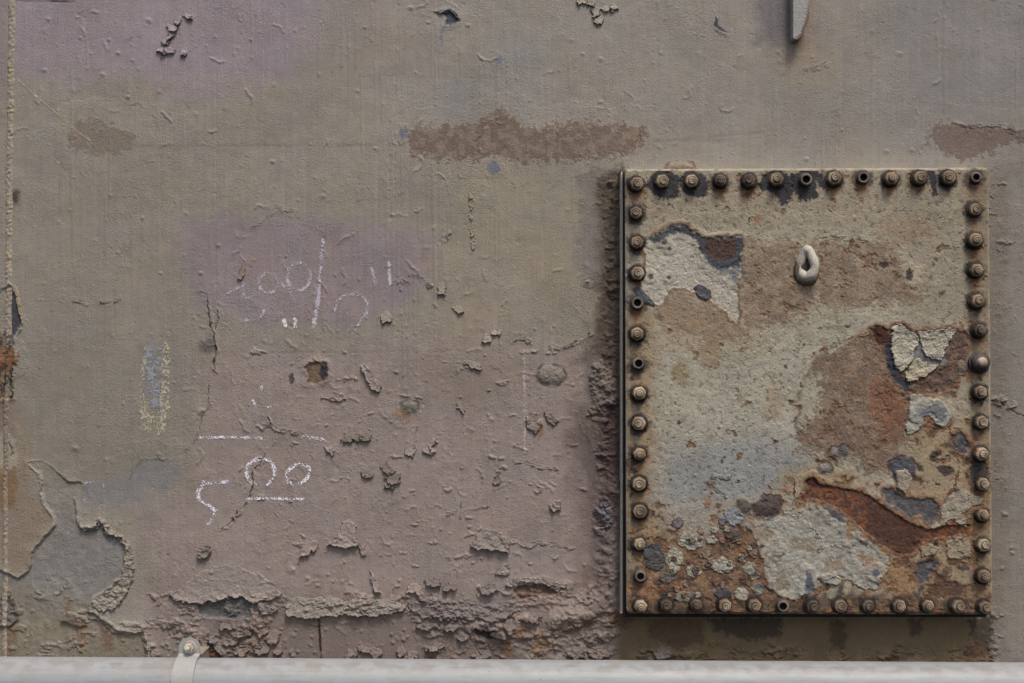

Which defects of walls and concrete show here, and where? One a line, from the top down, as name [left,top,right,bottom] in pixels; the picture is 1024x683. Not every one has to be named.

peeling [633,218,750,324]
crack [128,288,223,480]
peeling [284,355,347,402]
corrosion [628,206,980,611]
peeling [861,315,976,435]
peeling [0,459,151,657]
peeling [298,519,366,558]
peeling [169,528,572,659]
peeling [568,646,606,660]
corrosion [488,488,806,660]
peeling [754,478,882,602]